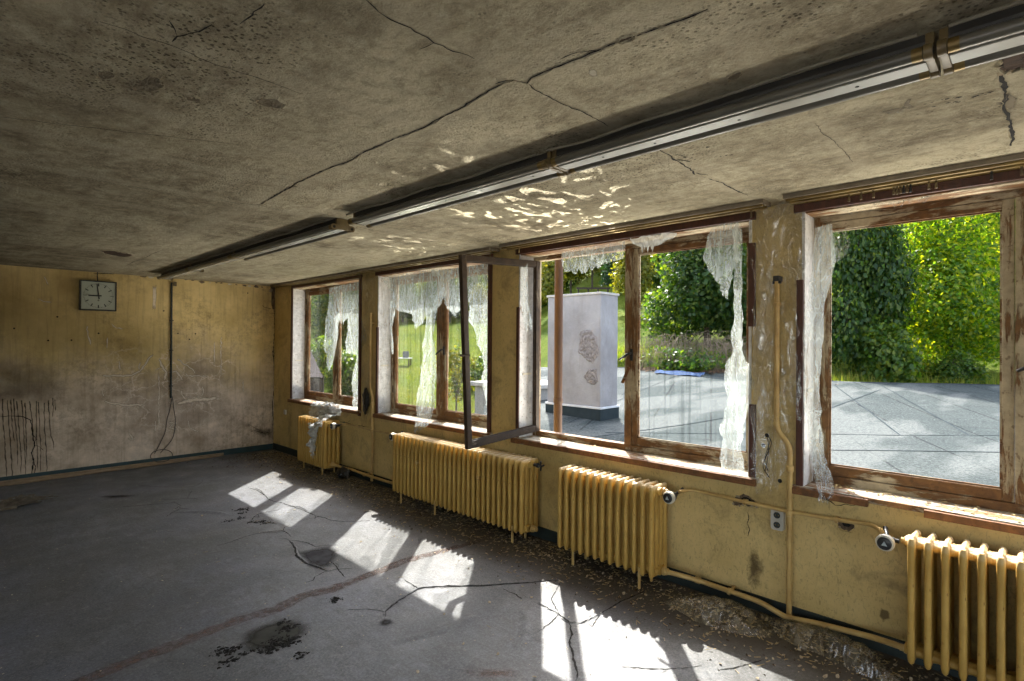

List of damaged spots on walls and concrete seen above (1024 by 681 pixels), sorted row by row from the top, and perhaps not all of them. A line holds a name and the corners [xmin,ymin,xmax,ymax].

crack [102,21,298,93]
crack [366,0,471,57]
crack [261,9,709,205]
crack [992,60,1015,146]
crack [660,149,750,195]
water stain [2,398,56,476]
crack [221,488,369,583]
water stain [244,621,305,649]
crack [349,579,646,680]